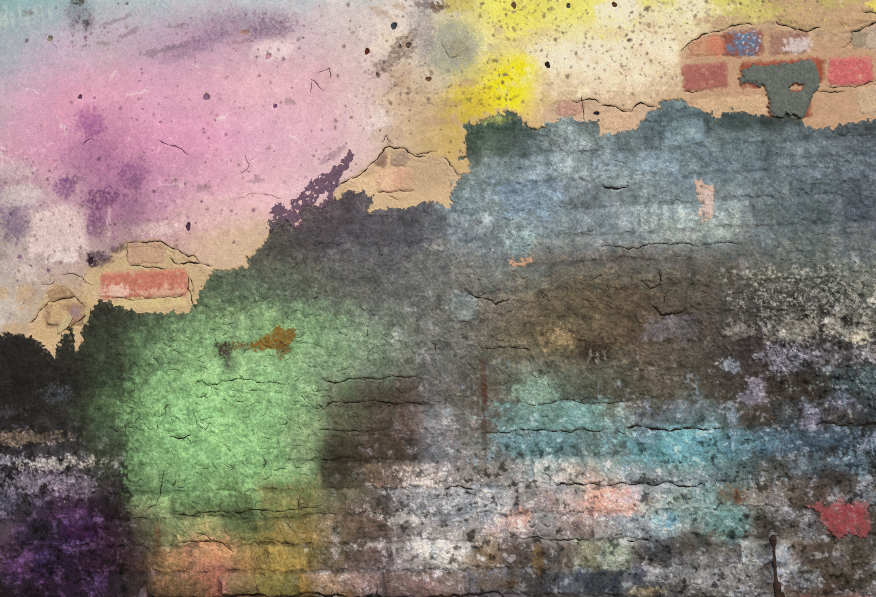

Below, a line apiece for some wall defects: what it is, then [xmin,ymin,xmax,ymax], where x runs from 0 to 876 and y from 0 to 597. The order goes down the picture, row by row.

spalling [679,21,876,130]
spalling [266,145,462,235]
spalling [28,239,212,359]
corrosion [232,325,296,360]
corrosion [769,535,785,597]